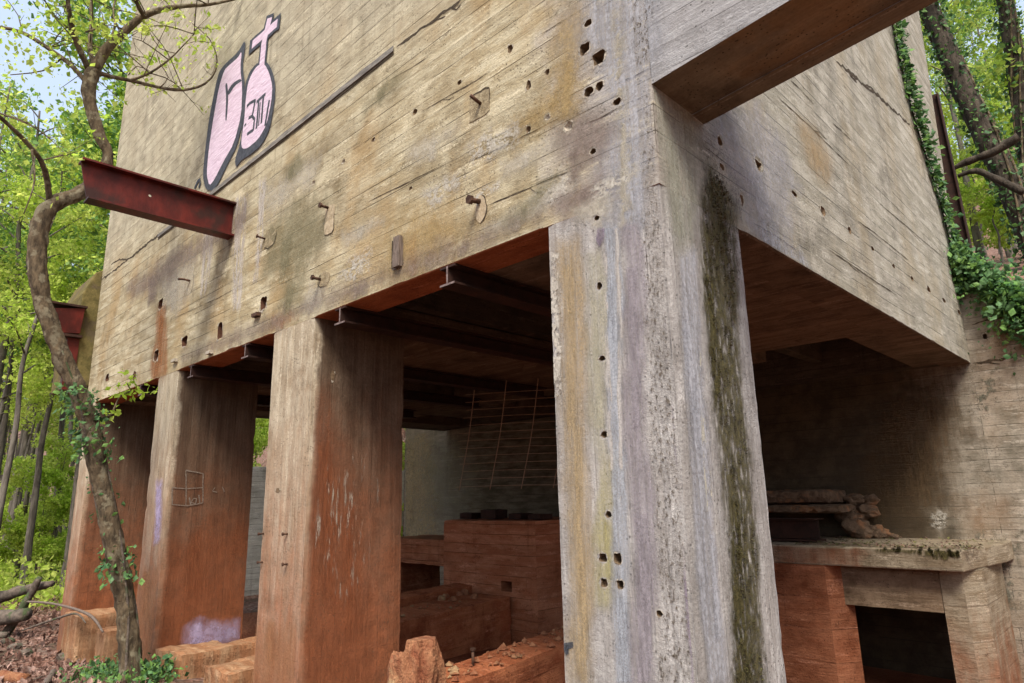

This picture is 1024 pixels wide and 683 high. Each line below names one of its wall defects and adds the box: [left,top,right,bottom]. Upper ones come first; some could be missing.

crack [392,0,460,79]
crack [836,61,910,125]
corrosion [151,306,167,377]
damp [681,253,751,683]
damp [931,550,949,560]